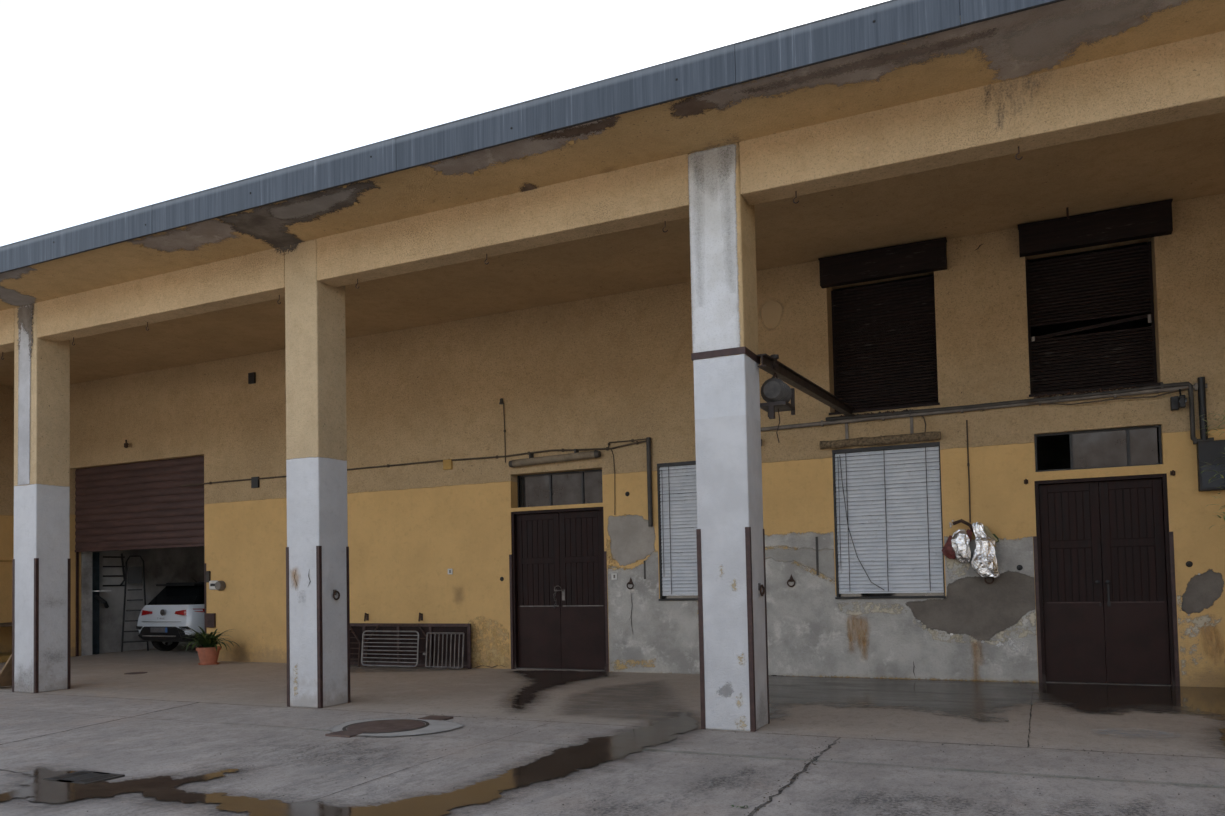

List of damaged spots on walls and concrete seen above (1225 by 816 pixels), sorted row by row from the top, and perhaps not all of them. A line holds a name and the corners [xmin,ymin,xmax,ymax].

peeling [692,0,1204,111]
peeling [416,116,622,176]
peeling [128,220,240,253]
flaking render [765,531,1038,682]